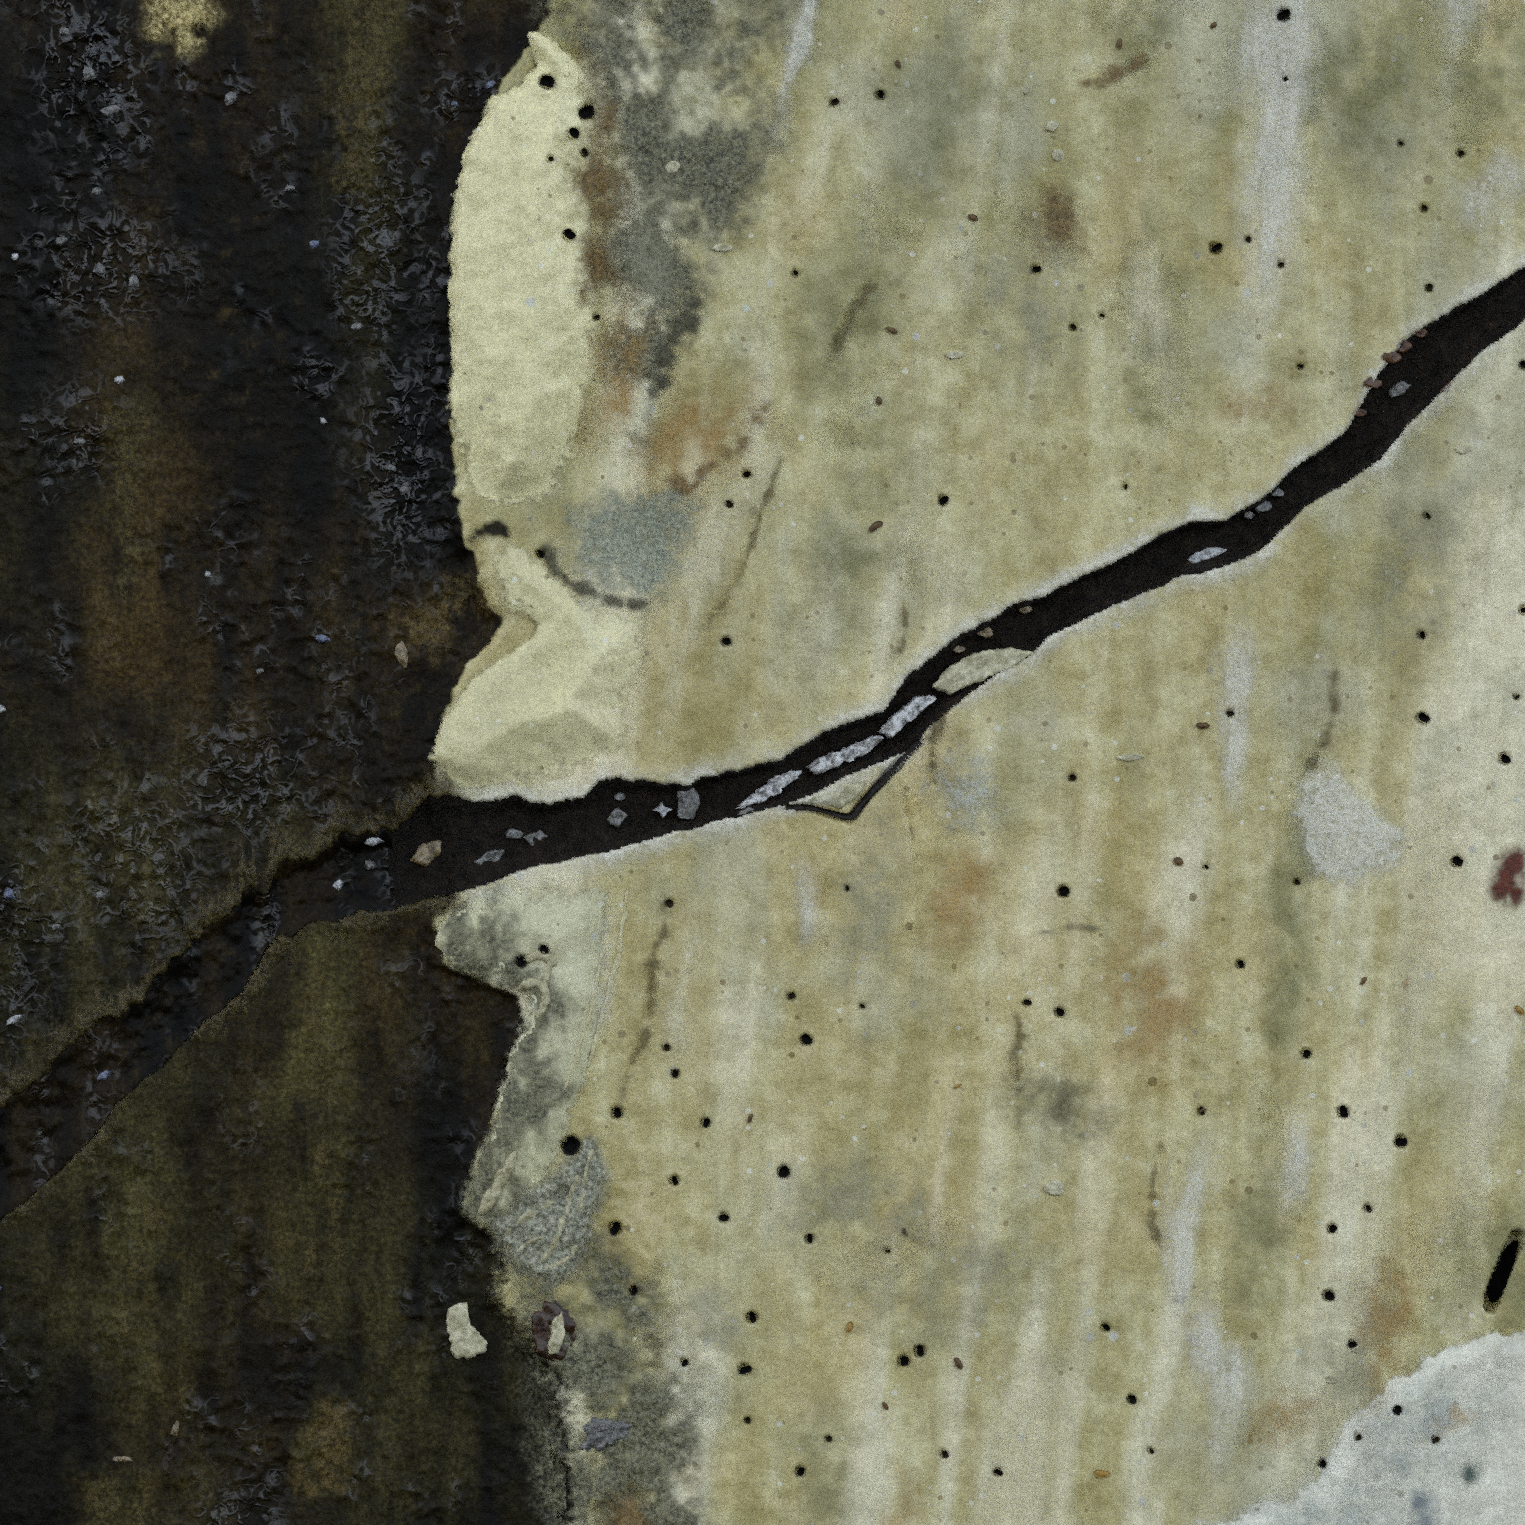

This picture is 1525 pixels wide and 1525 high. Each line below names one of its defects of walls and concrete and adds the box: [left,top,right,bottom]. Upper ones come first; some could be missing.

peeling [148,0,216,53]
efflorescence [784,0,816,88]
crack [0,256,1525,1219]
crack [1147,1146,1162,1240]
spalling [478,1136,608,1361]
spalling [446,1302,488,1360]
spalling [578,1417,632,1452]